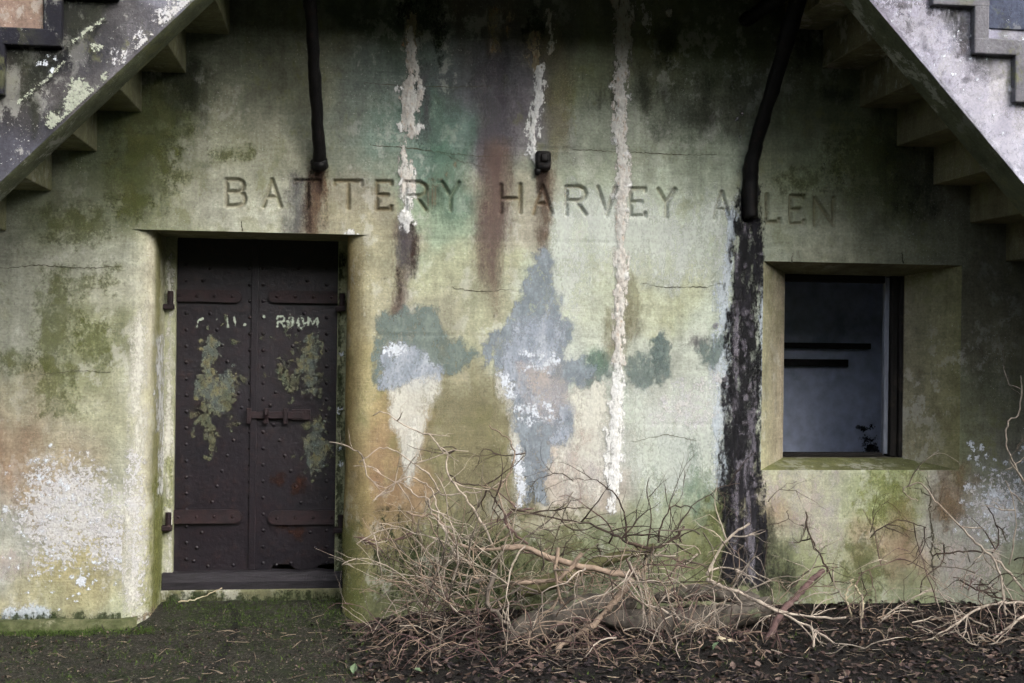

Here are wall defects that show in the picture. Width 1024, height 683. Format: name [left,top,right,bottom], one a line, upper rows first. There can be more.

damp [394,0,444,233]
damp [523,8,557,163]
rust [391,223,419,317]
damp [549,0,788,588]
peeling [189,314,247,461]
peeling [264,323,343,483]
damp [123,510,148,620]